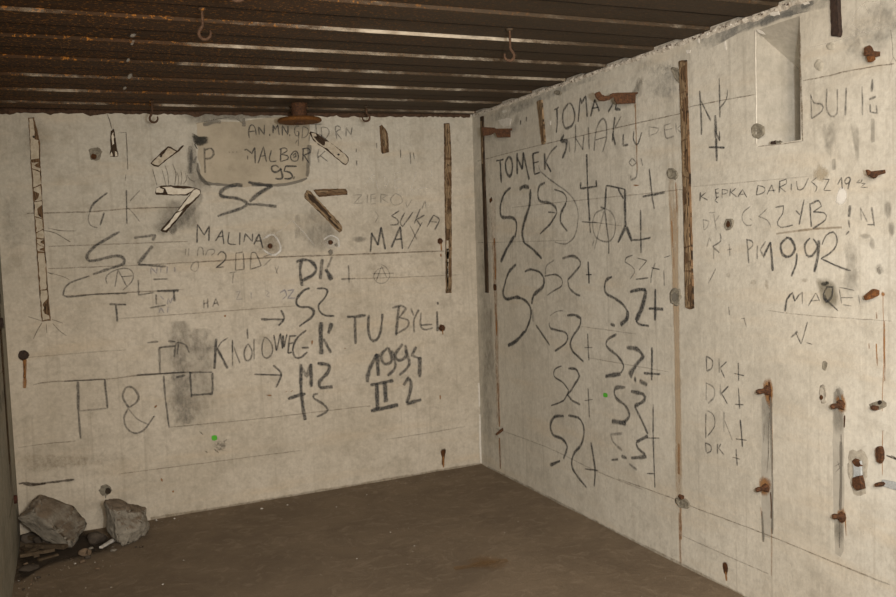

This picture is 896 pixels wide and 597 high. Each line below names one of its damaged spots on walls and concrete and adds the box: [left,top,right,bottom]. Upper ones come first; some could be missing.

corrosion [876,314,885,400]